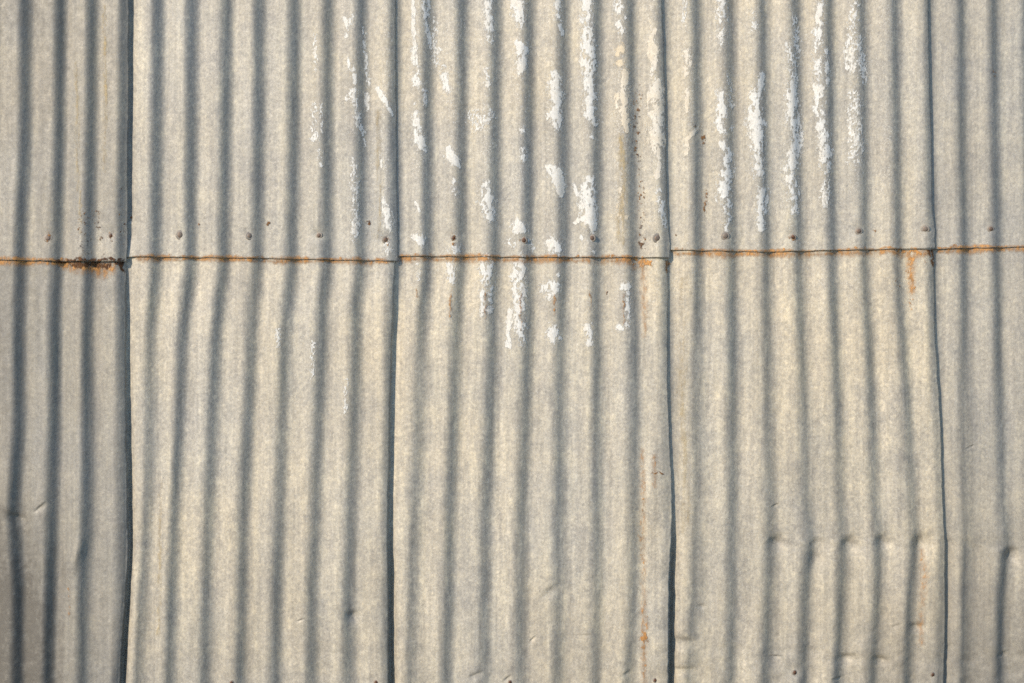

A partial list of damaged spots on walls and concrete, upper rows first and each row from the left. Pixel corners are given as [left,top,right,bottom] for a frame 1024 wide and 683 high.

peeling [410,0,451,152]
rust [401,235,590,262]
peeling [508,0,529,75]
peeling [504,217,565,350]
peeling [545,164,629,240]
peeling [576,0,601,139]
peeling [611,0,632,133]
rust [603,214,652,267]
peeling [644,28,667,228]
rust [665,237,811,273]
peeling [713,71,771,232]
peeling [780,0,834,216]